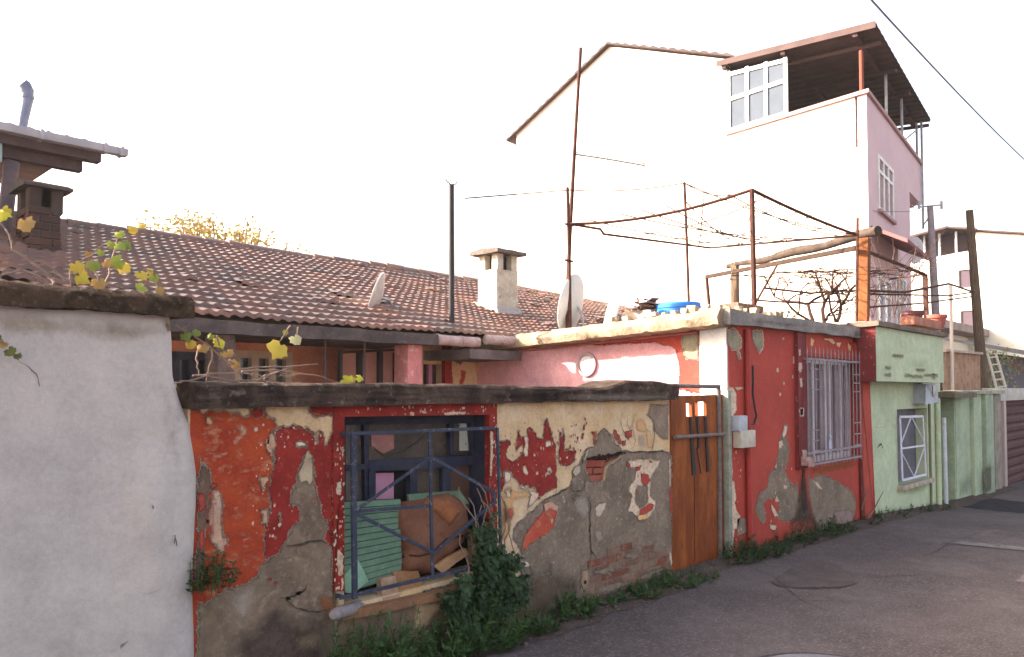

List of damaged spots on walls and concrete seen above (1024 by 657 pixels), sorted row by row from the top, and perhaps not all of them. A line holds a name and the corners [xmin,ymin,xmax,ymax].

spalling [455,308,764,394]
peeling [728,386,743,418]
crack [286,539,327,547]
spalling [194,406,475,657]
spalling [481,403,673,611]
spalling [732,424,856,541]
crack [280,583,329,613]